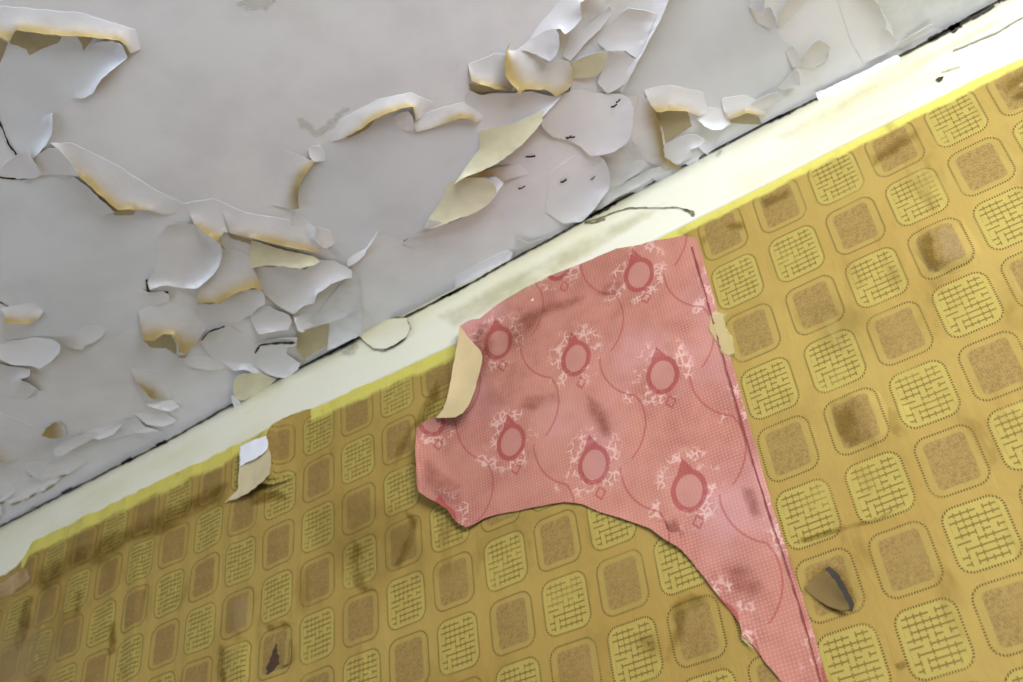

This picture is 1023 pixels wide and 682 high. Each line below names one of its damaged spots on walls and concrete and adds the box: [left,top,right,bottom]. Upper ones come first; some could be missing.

peeling [816,0,995,101]
peeling [0,0,830,408]
peeling [0,369,180,518]
peeling [225,409,311,502]